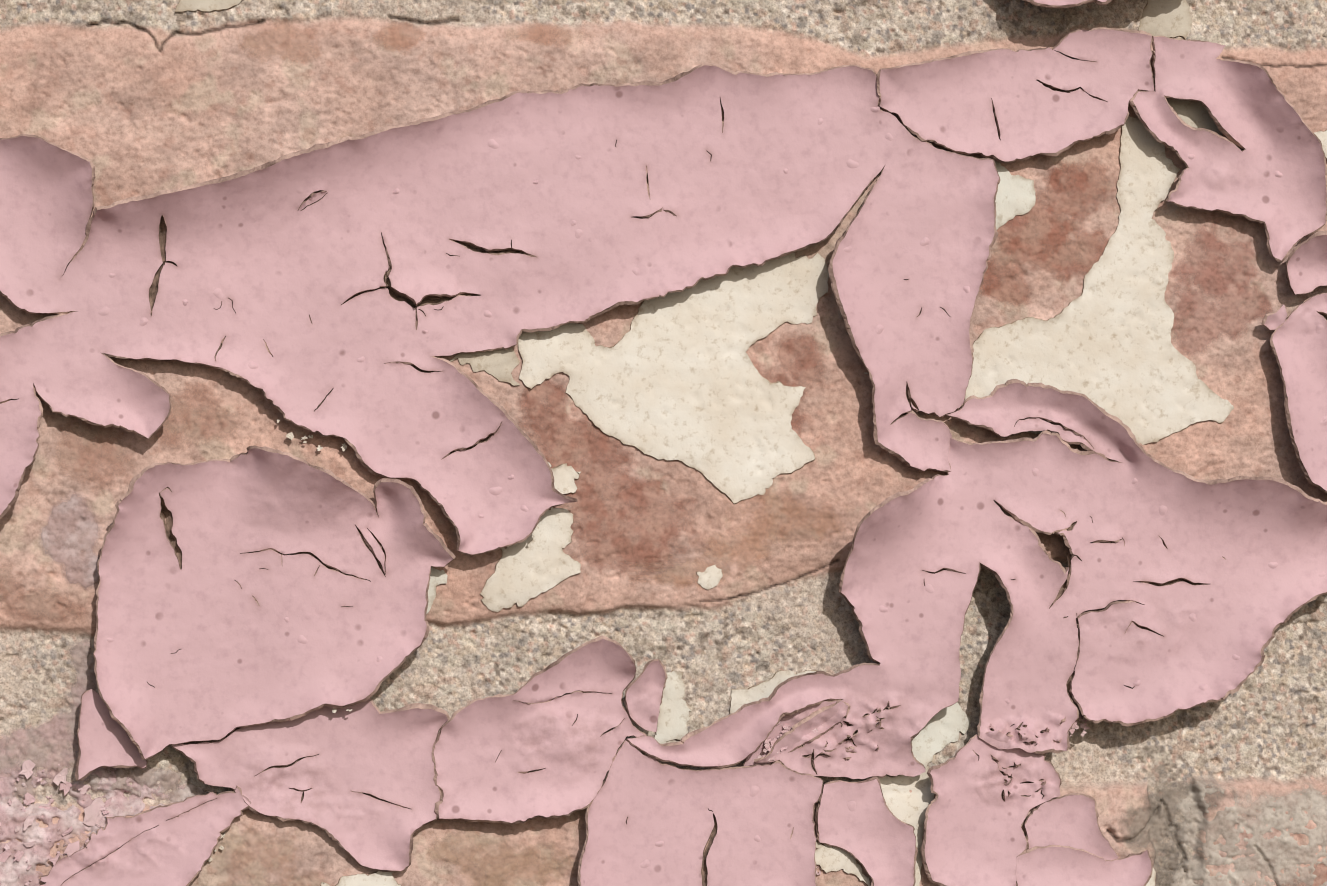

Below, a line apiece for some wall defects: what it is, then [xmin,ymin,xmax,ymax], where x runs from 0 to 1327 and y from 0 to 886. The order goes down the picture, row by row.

peeling [876,27,1327,295]
crack [149,215,177,315]
crack [344,233,480,313]
crack [446,240,524,256]
peeling [1172,228,1327,493]
peeling [0,63,1108,886]
crack [159,487,182,569]
crack [241,525,385,607]
peeling [432,379,1327,886]
crack [701,809,717,886]